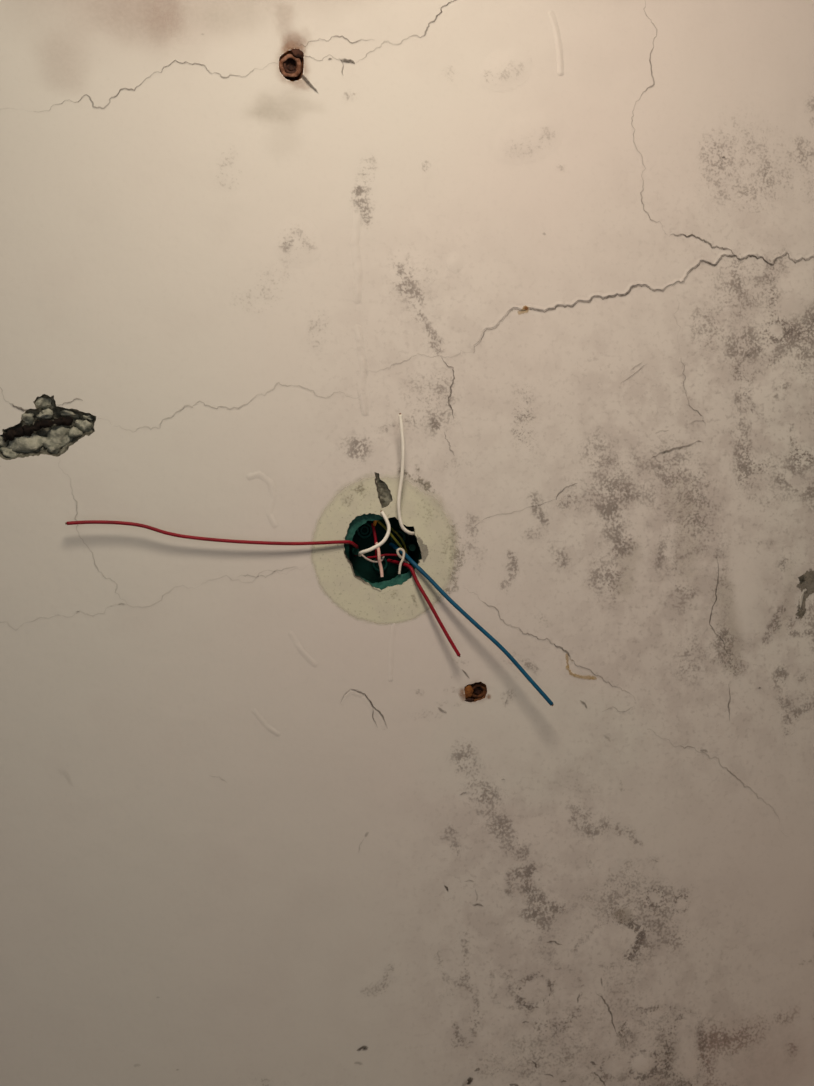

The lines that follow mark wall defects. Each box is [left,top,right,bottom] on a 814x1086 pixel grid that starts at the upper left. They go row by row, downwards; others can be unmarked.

rust [287,44,304,58]
crack [448,234,814,413]
spalling [0,394,96,460]
peeling [796,569,814,619]
crack [341,690,386,730]
rust [463,684,474,702]